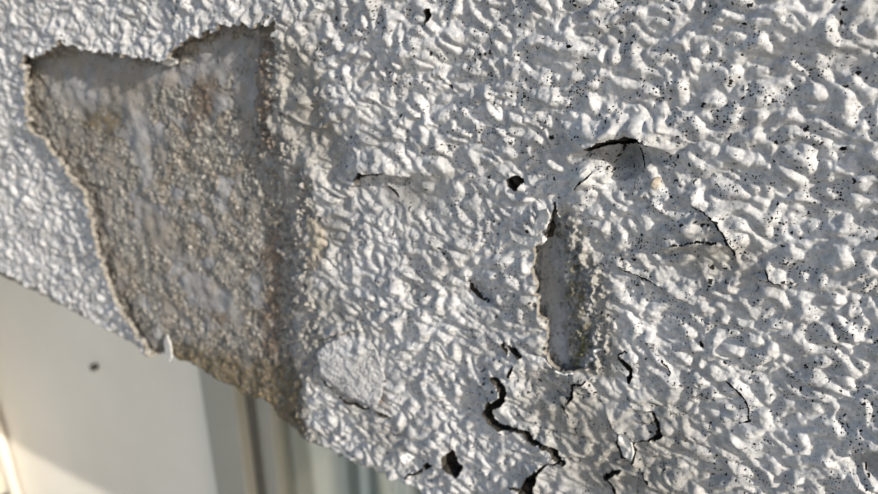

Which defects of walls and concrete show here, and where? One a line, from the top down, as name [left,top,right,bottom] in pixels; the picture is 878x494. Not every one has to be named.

spalling [19,15,385,440]
crack [481,342,566,494]
spalling [509,207,603,376]
crack [560,381,586,419]
crack [617,350,633,384]
crack [603,411,663,494]